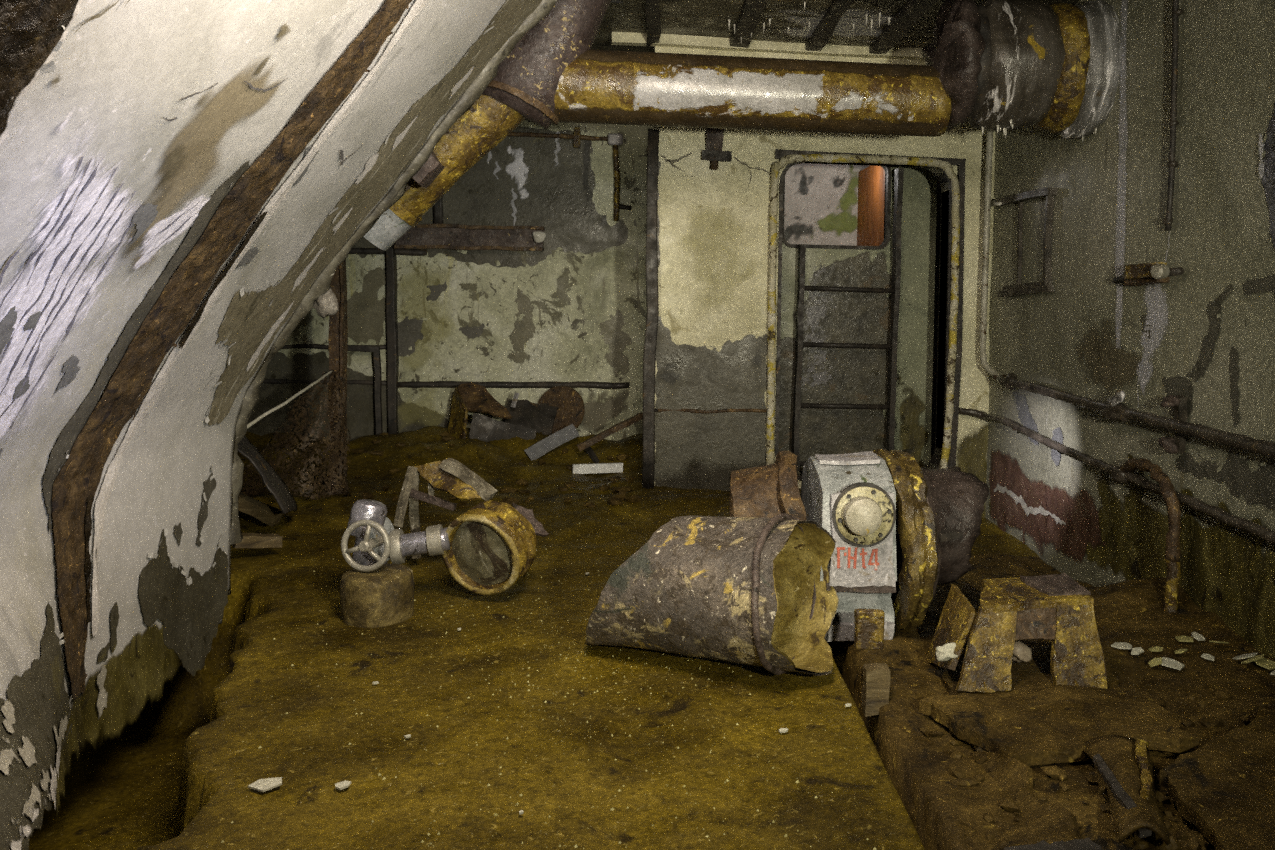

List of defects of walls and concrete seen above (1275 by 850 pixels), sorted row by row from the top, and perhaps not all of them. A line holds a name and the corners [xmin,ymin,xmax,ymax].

crack [74,0,130,34]
damp [0,56,287,455]
spalling [43,160,250,533]
corrosion [173,211,268,350]
peeling [205,0,542,426]
peeling [412,126,628,364]
peeling [196,465,216,546]
corrosion [989,450,1106,562]
peeling [98,602,119,662]
peeling [139,523,229,676]